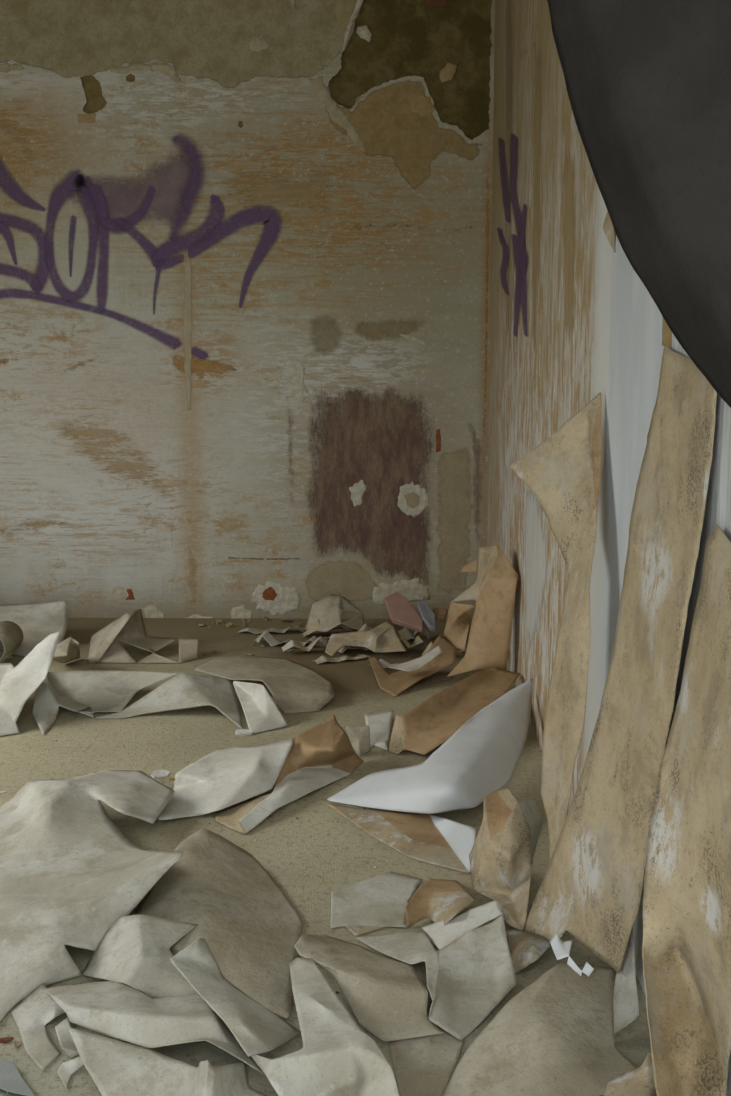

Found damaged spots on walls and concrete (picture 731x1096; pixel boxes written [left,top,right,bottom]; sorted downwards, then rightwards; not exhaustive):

peeling [0,0,492,189]